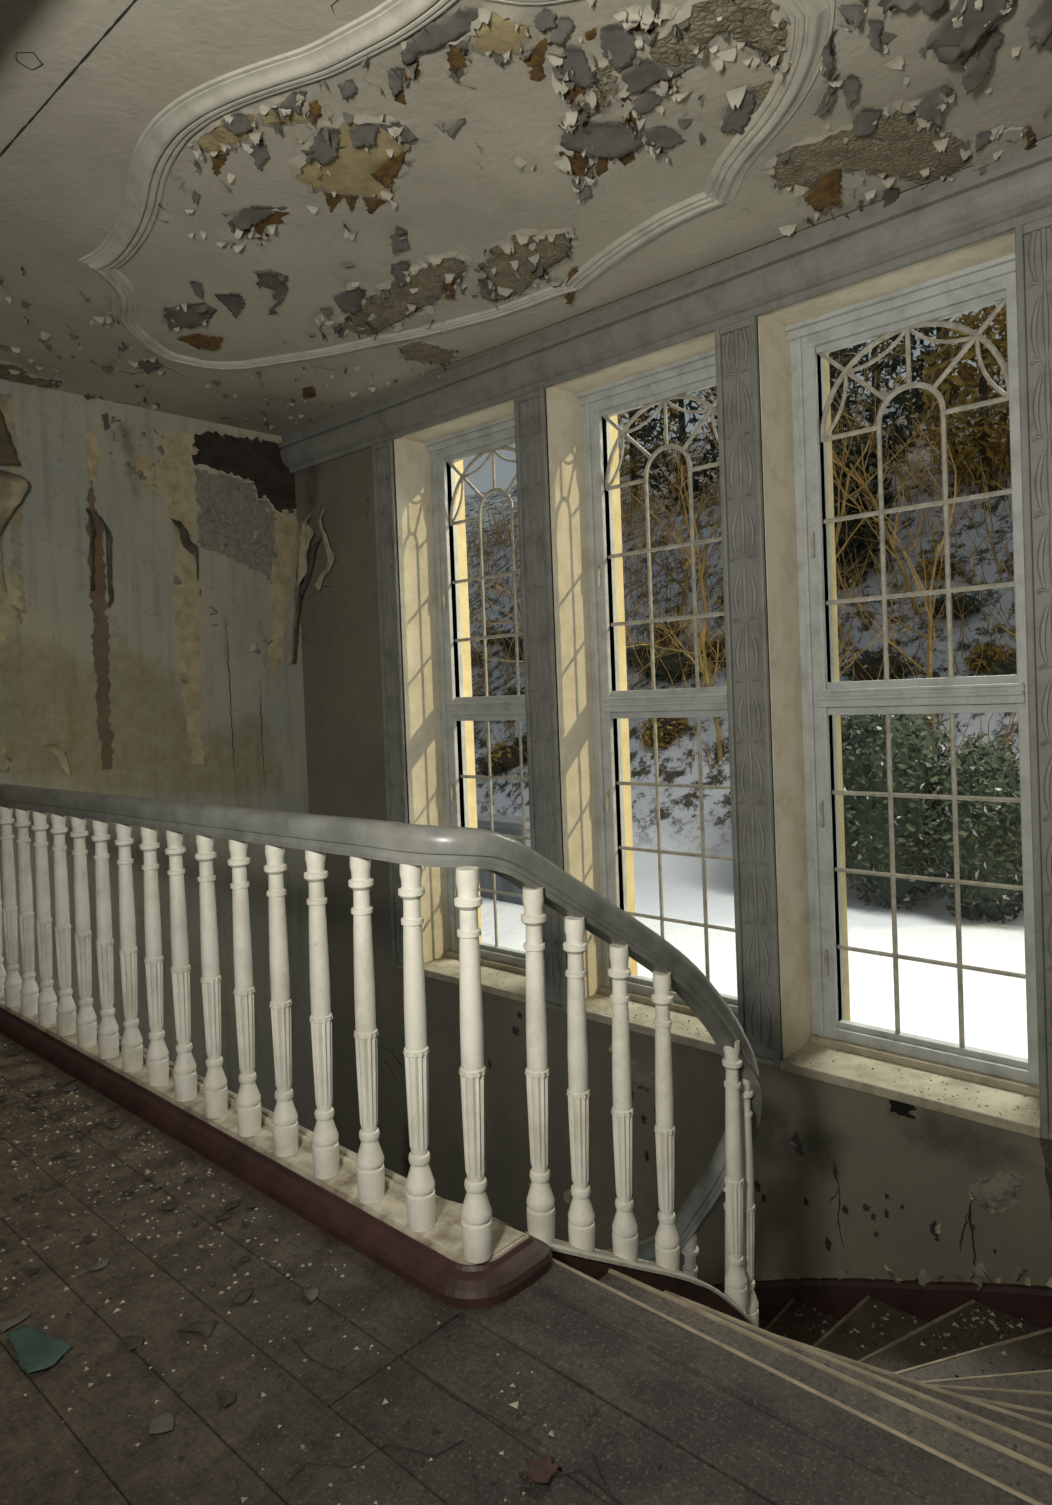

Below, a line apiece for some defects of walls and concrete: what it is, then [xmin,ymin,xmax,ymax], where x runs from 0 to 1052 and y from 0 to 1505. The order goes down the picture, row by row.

peeling [762,0,1052,236]
peeling [164,0,793,518]
peeling [0,266,165,410]
peeling [630,1054,656,1124]
flaking render [885,1098,921,1124]
peeling [842,1193,904,1238]